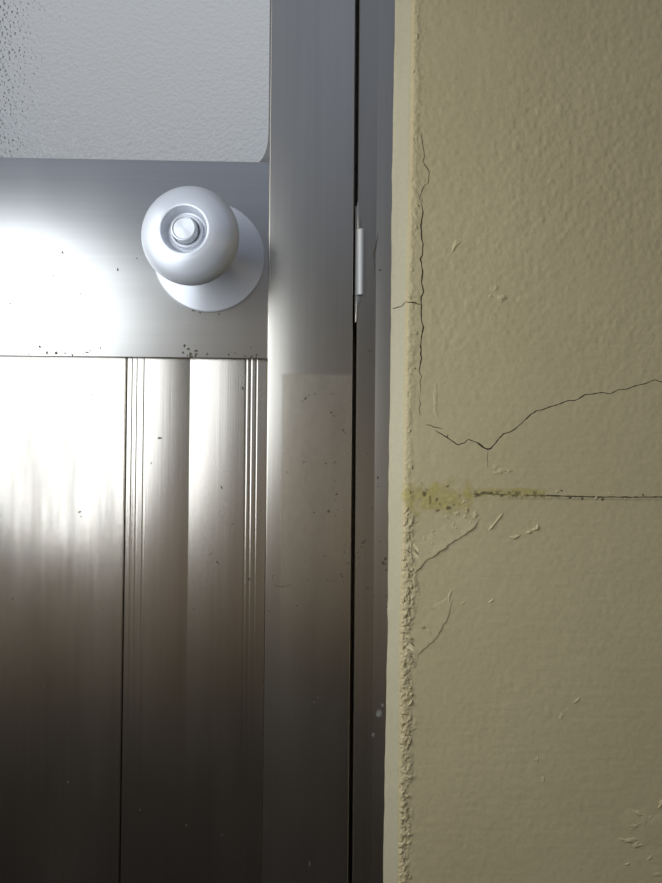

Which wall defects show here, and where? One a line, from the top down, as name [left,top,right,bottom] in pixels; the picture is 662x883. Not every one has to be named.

crack [393,132,662,467]
crack [471,490,662,501]